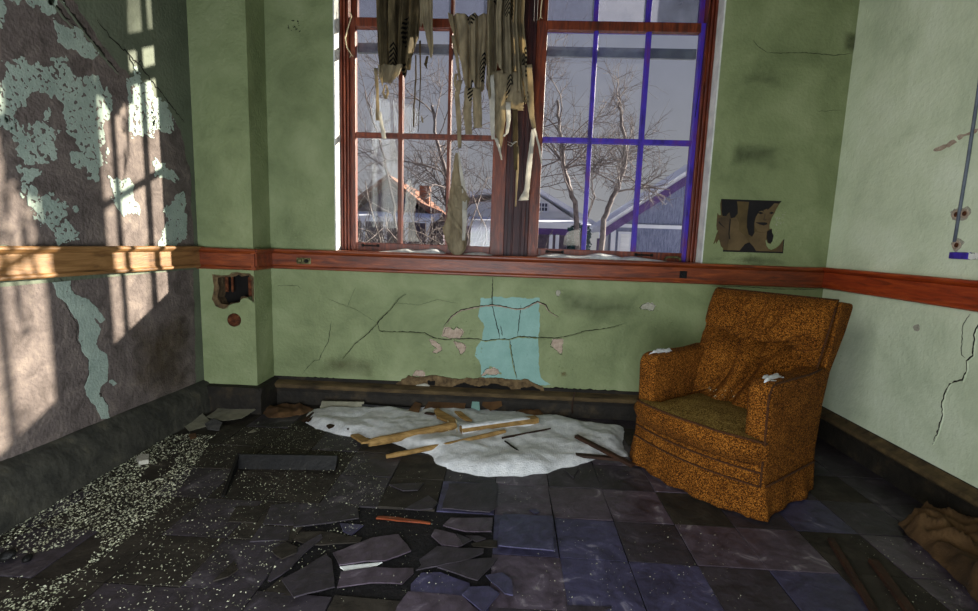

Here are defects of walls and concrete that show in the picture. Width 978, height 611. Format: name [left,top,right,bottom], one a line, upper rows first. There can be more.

peeling [0,0,195,246]
peeling [0,269,196,461]
spalling [212,272,254,309]
crack [303,277,624,380]
spalling [396,366,544,391]
crack [932,316,978,445]